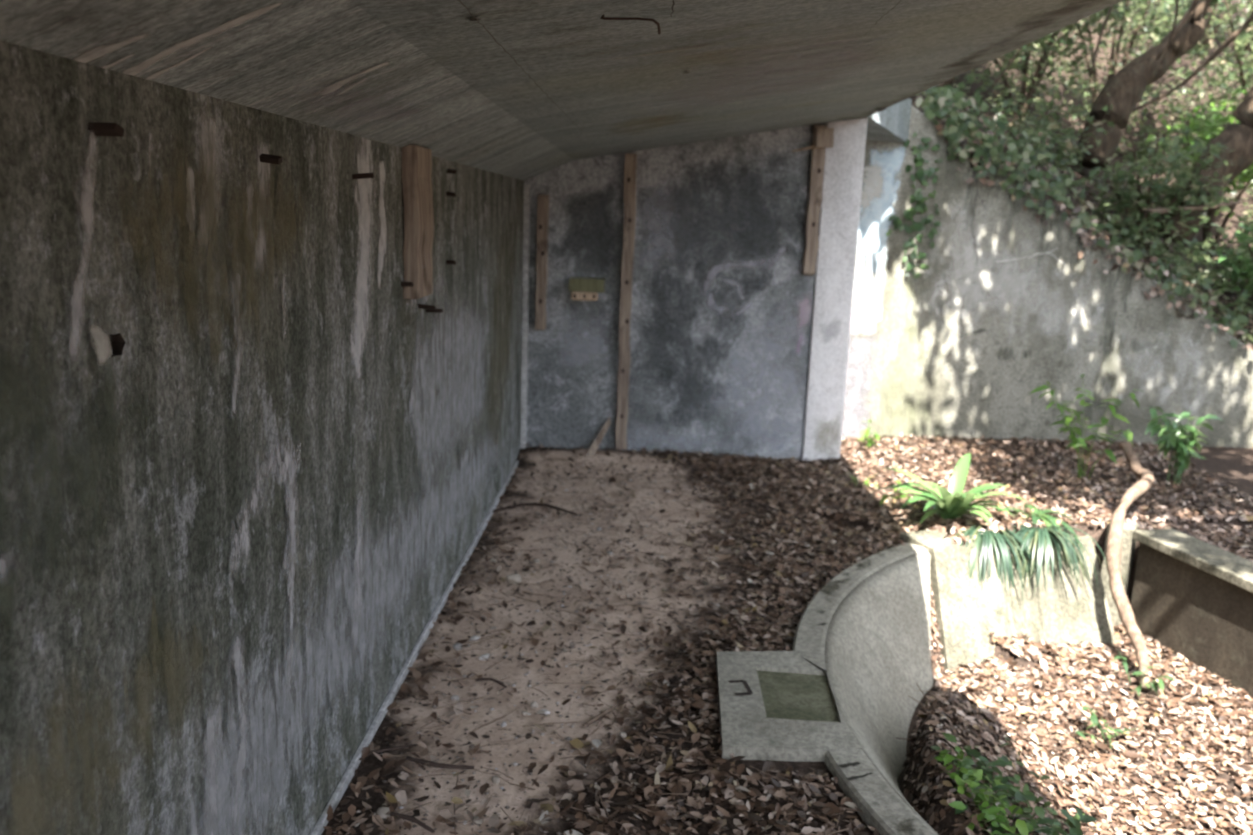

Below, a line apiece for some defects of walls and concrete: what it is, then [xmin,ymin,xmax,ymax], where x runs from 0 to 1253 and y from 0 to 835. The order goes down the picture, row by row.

leakage [70,132,112,363]
leakage [628,155,805,451]